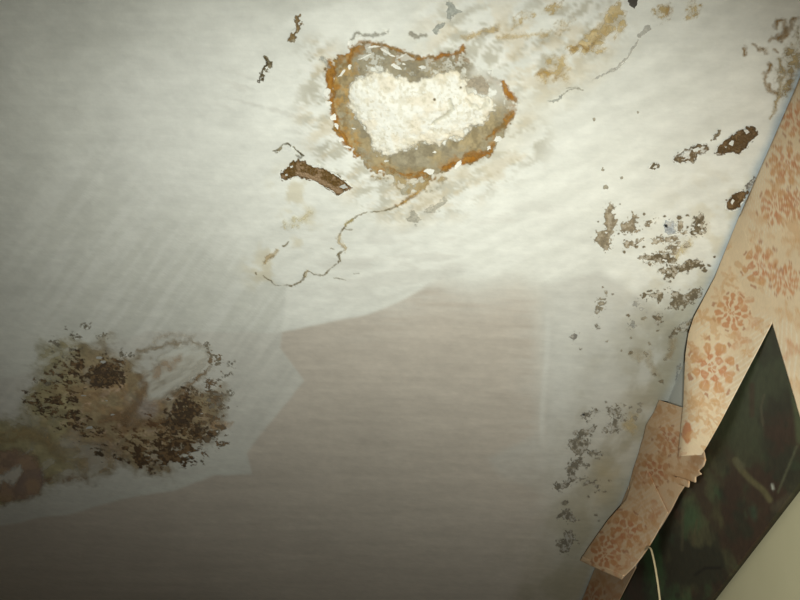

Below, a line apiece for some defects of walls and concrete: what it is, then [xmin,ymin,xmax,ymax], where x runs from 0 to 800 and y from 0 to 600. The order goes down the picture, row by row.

flaking render [288,14,303,42]
flaking render [257,56,272,83]
flaking render [273,143,352,197]
flaking render [672,126,758,164]
flaking render [725,177,756,212]
crack [255,206,398,287]
peeling [594,203,716,339]
leakage [0,323,238,504]
peeling [554,401,642,497]
peeling [556,500,579,553]